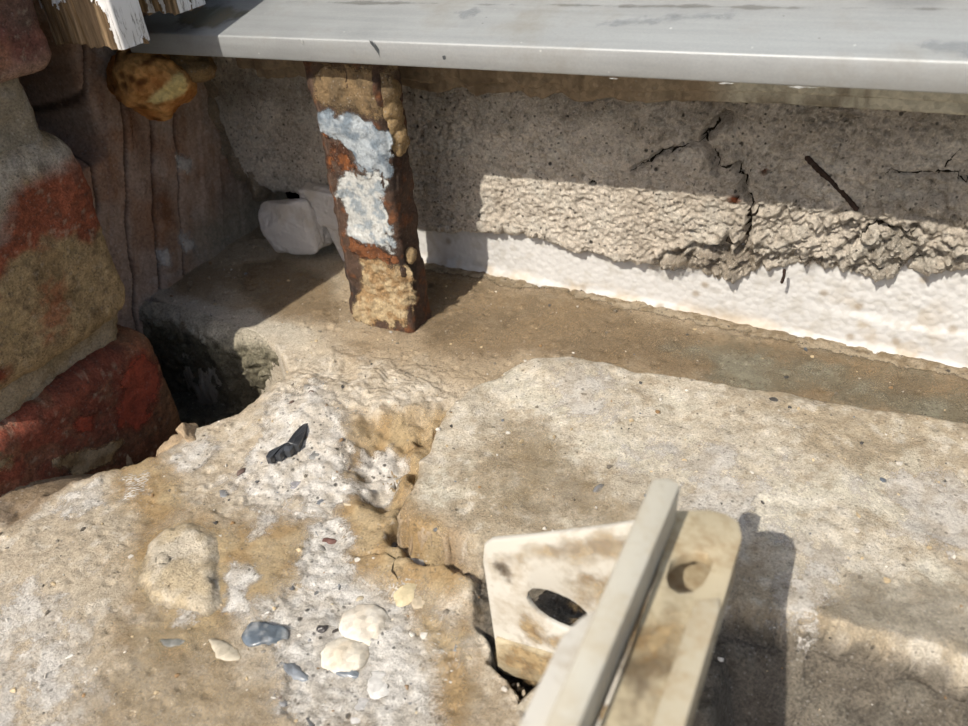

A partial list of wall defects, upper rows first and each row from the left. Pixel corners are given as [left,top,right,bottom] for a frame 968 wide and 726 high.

corrosion [322,133,355,172]
crack [632,113,764,245]
crack [886,149,968,182]
crack [860,219,915,240]
corrosion [348,238,399,264]
spalling [121,472,151,501]
spalling [139,301,469,726]
peeling [0,575,119,726]